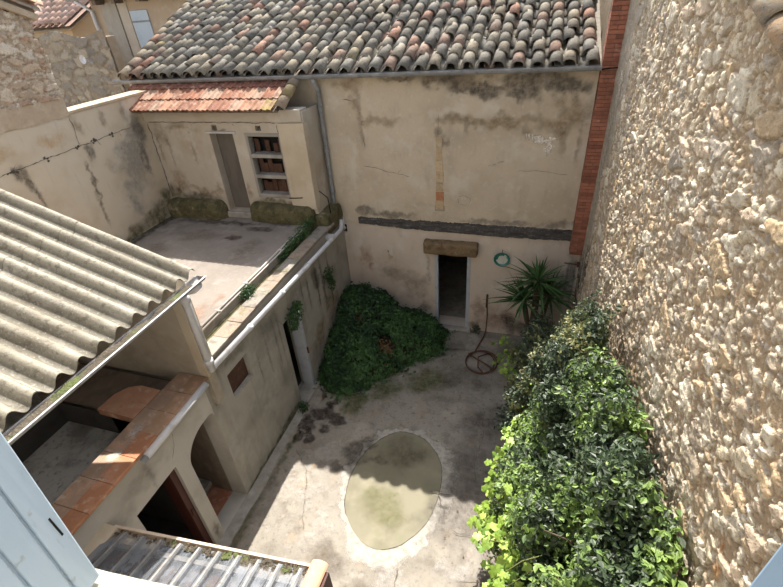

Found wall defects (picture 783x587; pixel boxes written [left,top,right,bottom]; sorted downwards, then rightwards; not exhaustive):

damp [426,72,587,99]